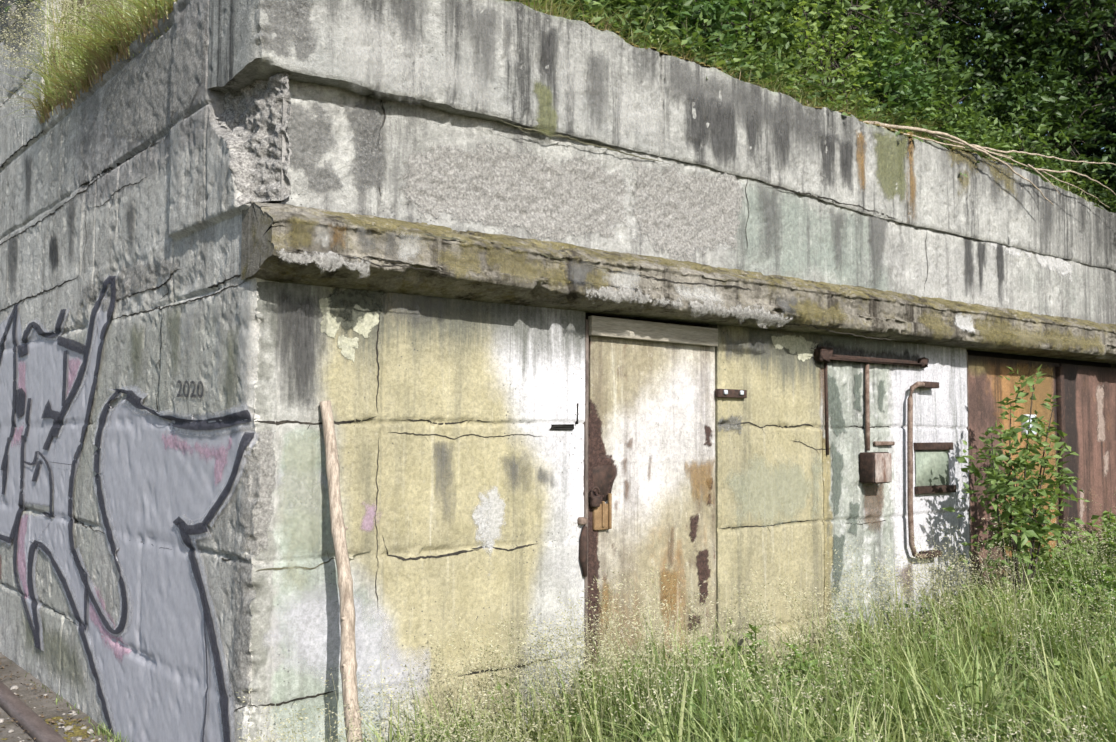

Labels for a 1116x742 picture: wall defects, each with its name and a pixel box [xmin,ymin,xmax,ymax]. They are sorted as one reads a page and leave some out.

crack [0,140,161,311]
spalling [216,73,387,205]
spalling [402,142,744,261]
leakage [673,66,853,186]
leakage [278,294,319,403]
peeling [279,248,383,362]
spalling [586,286,819,362]
crack [222,314,544,600]
crack [741,422,831,455]
corrosion [1012,364,1056,510]
corrosion [583,400,618,669]
corrosion [685,463,713,631]